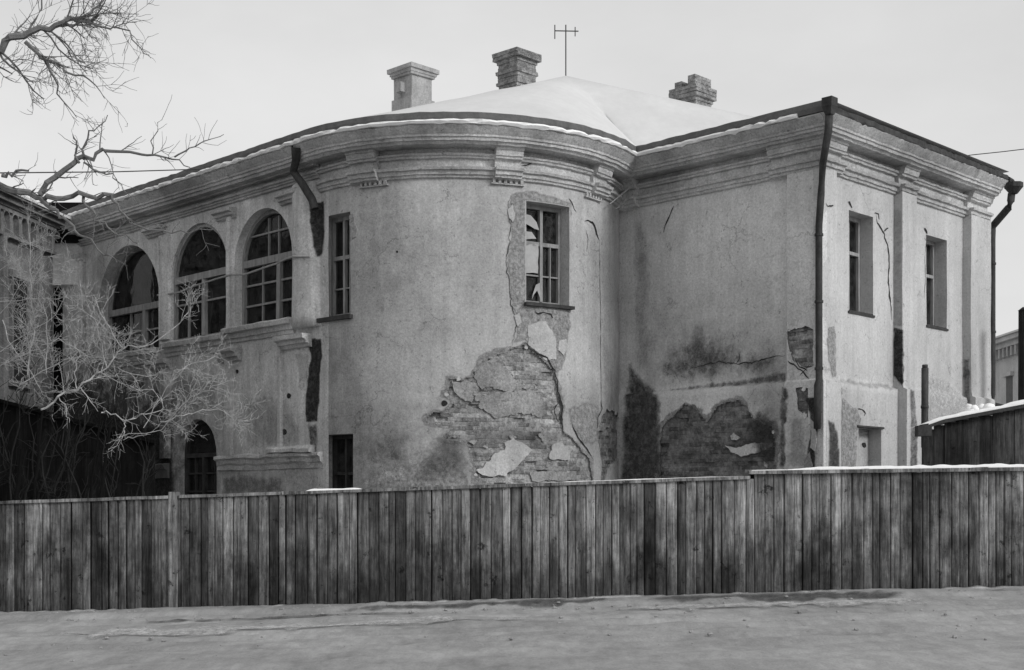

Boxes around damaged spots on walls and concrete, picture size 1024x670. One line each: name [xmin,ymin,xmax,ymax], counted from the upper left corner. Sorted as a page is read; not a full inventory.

damp [310,201,324,256]
crack [826,201,892,319]
damp [305,338,322,448]
flaking render [363,191,619,488]
damp [622,368,660,483]
flaking render [656,396,781,478]
damp [665,343,788,466]
crack [695,354,810,379]
flaking render [787,326,814,368]